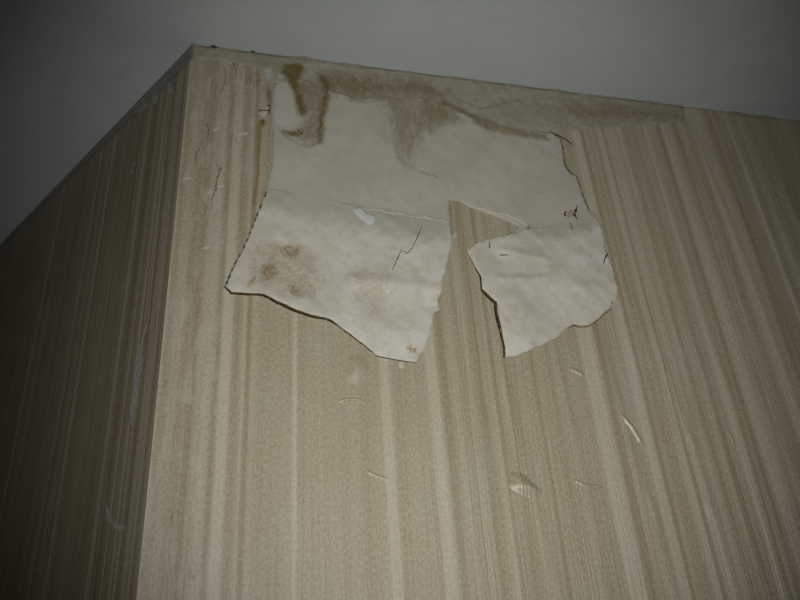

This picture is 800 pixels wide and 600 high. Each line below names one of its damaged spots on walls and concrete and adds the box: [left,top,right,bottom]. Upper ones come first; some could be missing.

damp [279,61,549,179]
flaking render [191,46,684,238]